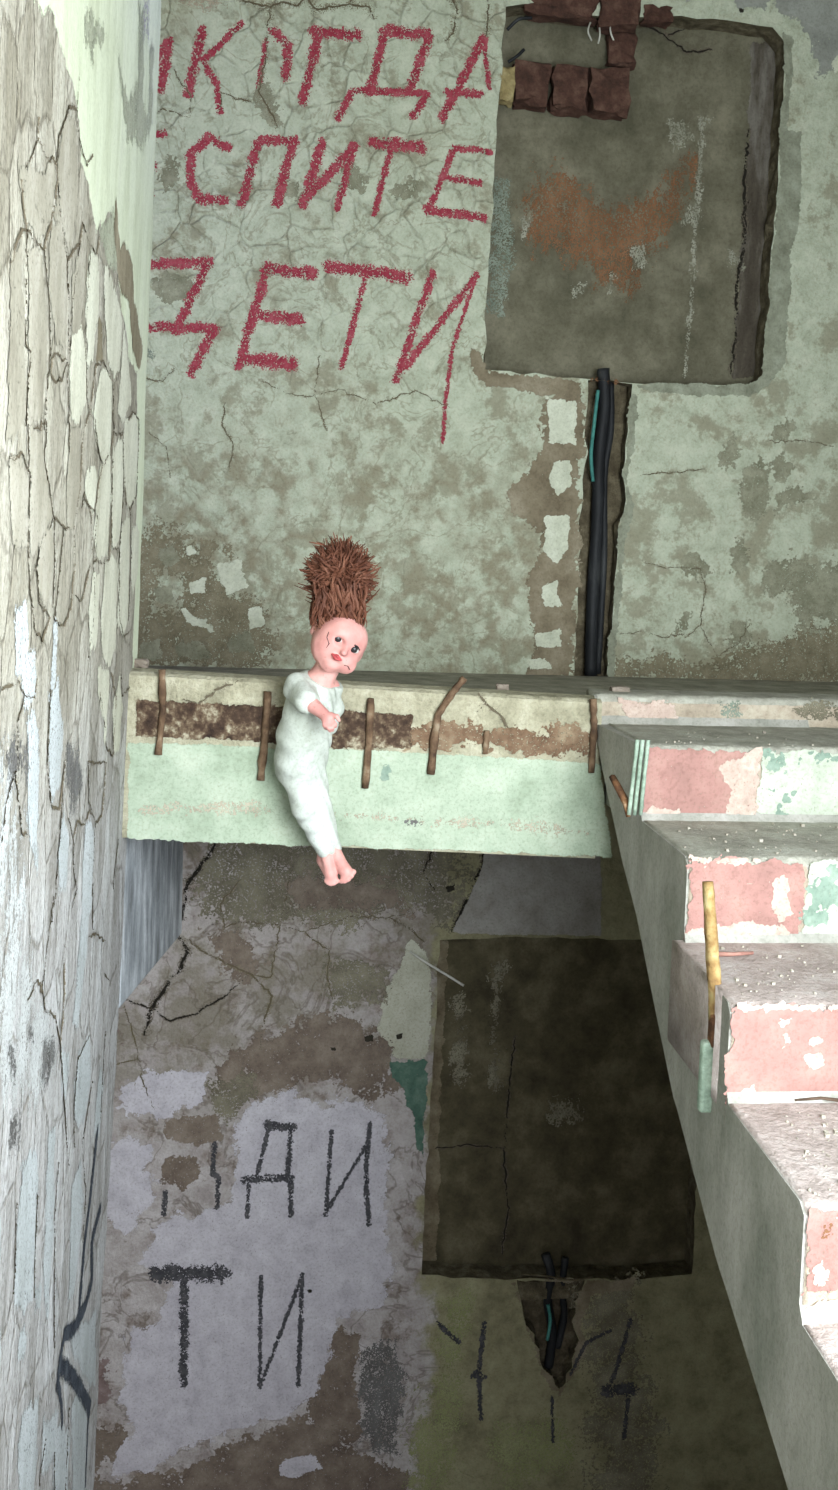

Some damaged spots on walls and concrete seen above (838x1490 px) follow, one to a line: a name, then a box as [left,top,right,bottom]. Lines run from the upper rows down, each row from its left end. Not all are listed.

crack [158,0,377,129]
crack [443,0,493,42]
flaking render [512,0,690,121]
flaking render [607,0,838,677]
peeling [470,348,597,676]
flaking render [0,0,428,1490]
crack [1,77,485,1348]
peeling [719,747,763,815]
peeling [688,854,761,868]
peeling [686,874,794,935]
flaking render [526,1277,636,1396]
crack [39,1408,70,1490]